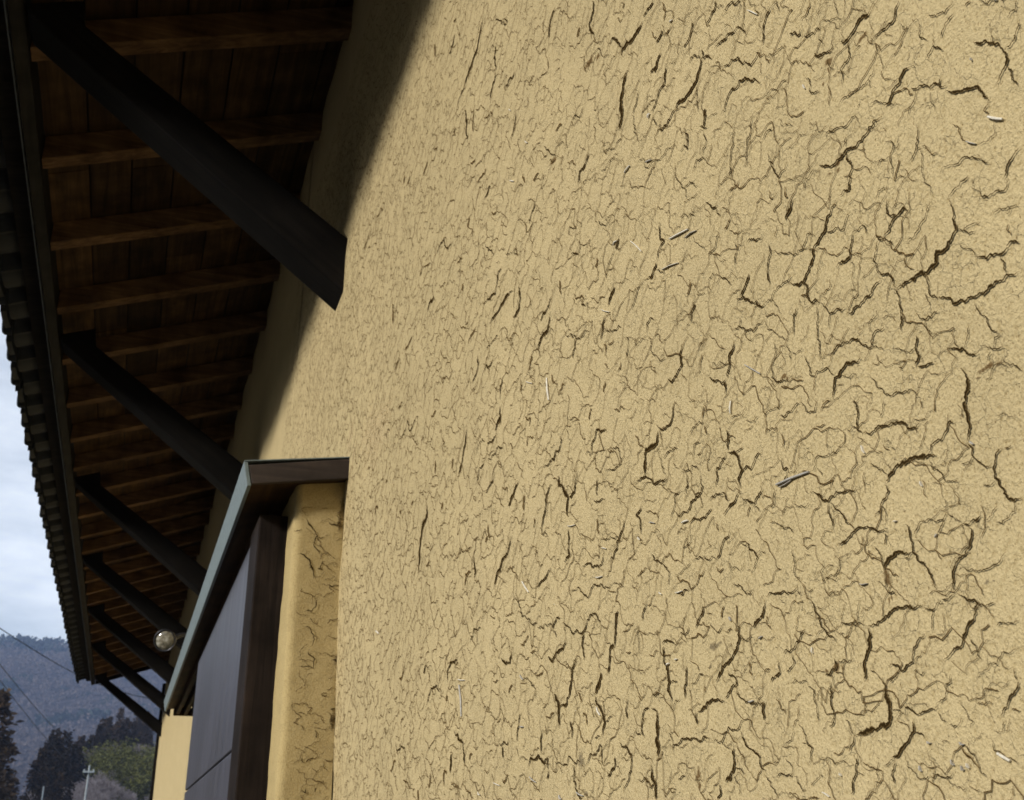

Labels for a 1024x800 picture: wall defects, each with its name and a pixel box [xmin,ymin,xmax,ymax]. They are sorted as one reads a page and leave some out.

crack [282,0,1024,800]